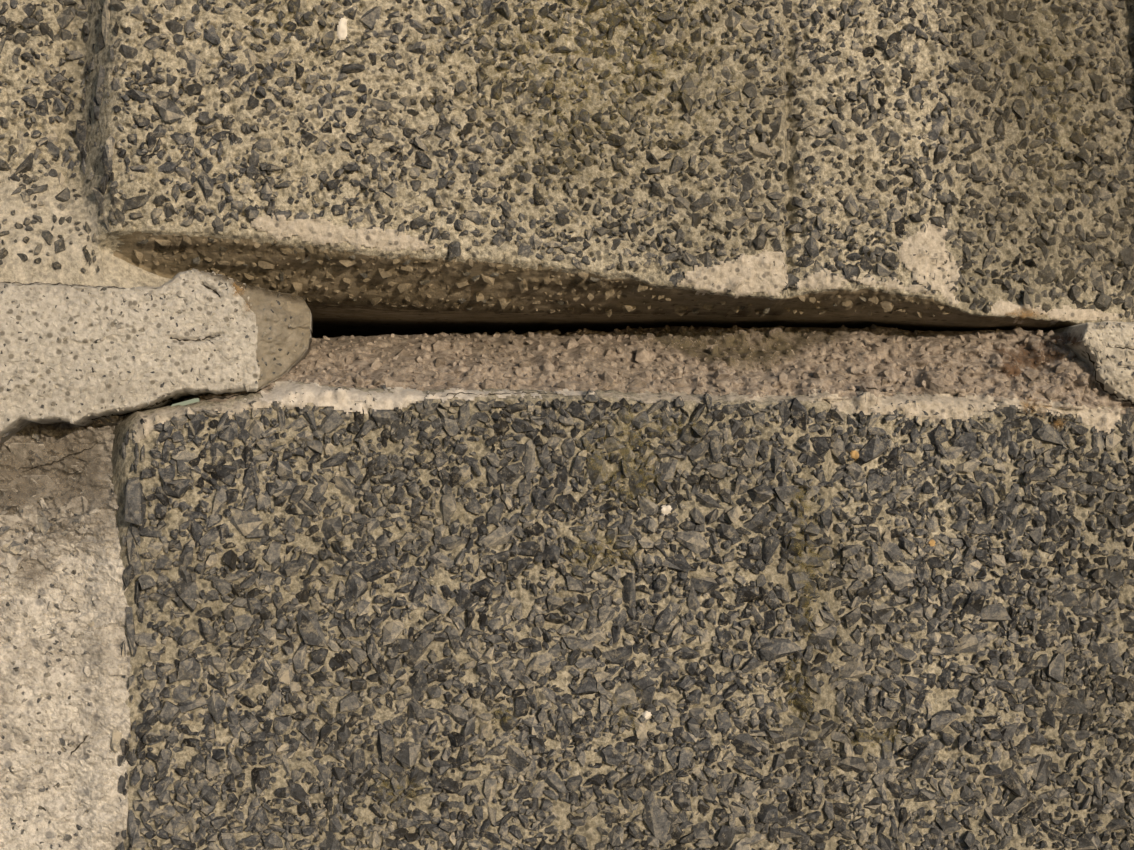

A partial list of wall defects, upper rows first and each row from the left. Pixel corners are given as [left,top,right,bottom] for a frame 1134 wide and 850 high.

spalling [0,213,1134,850]